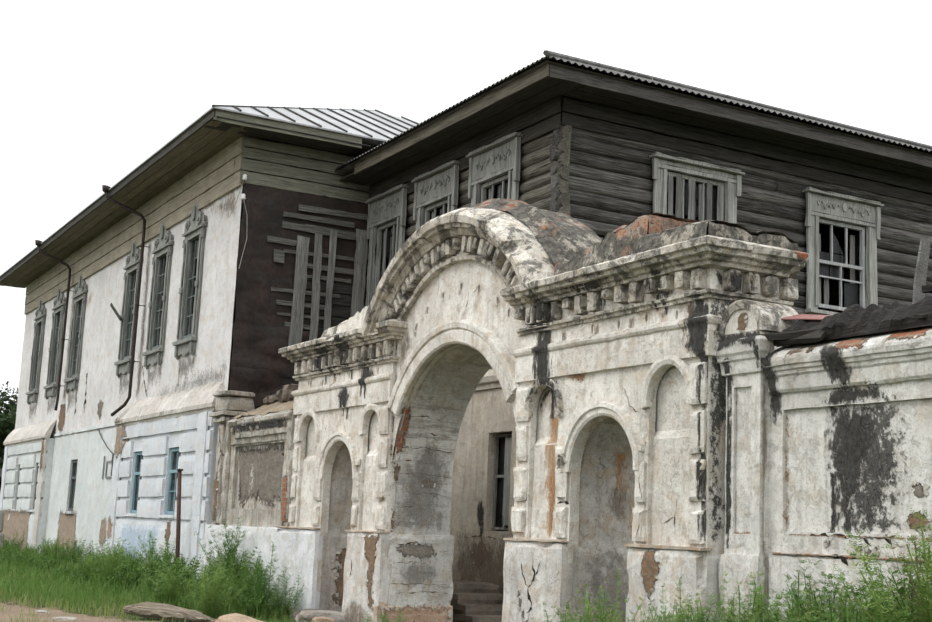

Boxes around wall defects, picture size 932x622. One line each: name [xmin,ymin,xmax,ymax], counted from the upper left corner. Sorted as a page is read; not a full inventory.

water stain [525,285,565,420]
spalling [389,405,412,485]
water stain [682,267,792,553]
water stain [819,345,907,542]
peeling [2,507,32,550]
peeling [56,509,77,557]
peeling [98,516,116,550]
spalling [364,509,395,612]
crack [521,557,540,622]